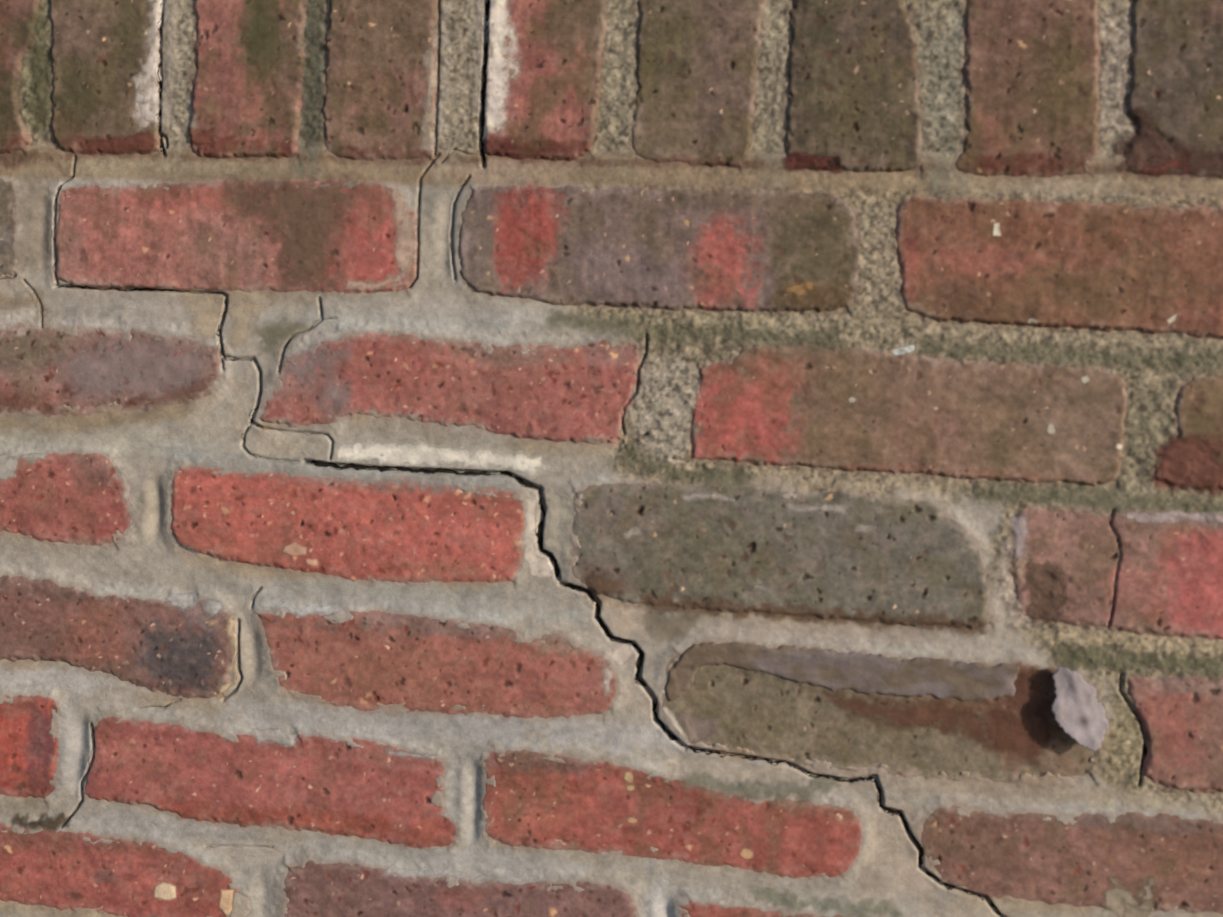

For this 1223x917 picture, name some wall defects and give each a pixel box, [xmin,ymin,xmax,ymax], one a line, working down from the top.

crack [348,0,490,294]
crack [5,157,1003,917]
crack [1109,512,1119,624]
peeling [665,642,1020,702]
peeling [1051,667,1108,752]
crack [1119,674,1147,785]